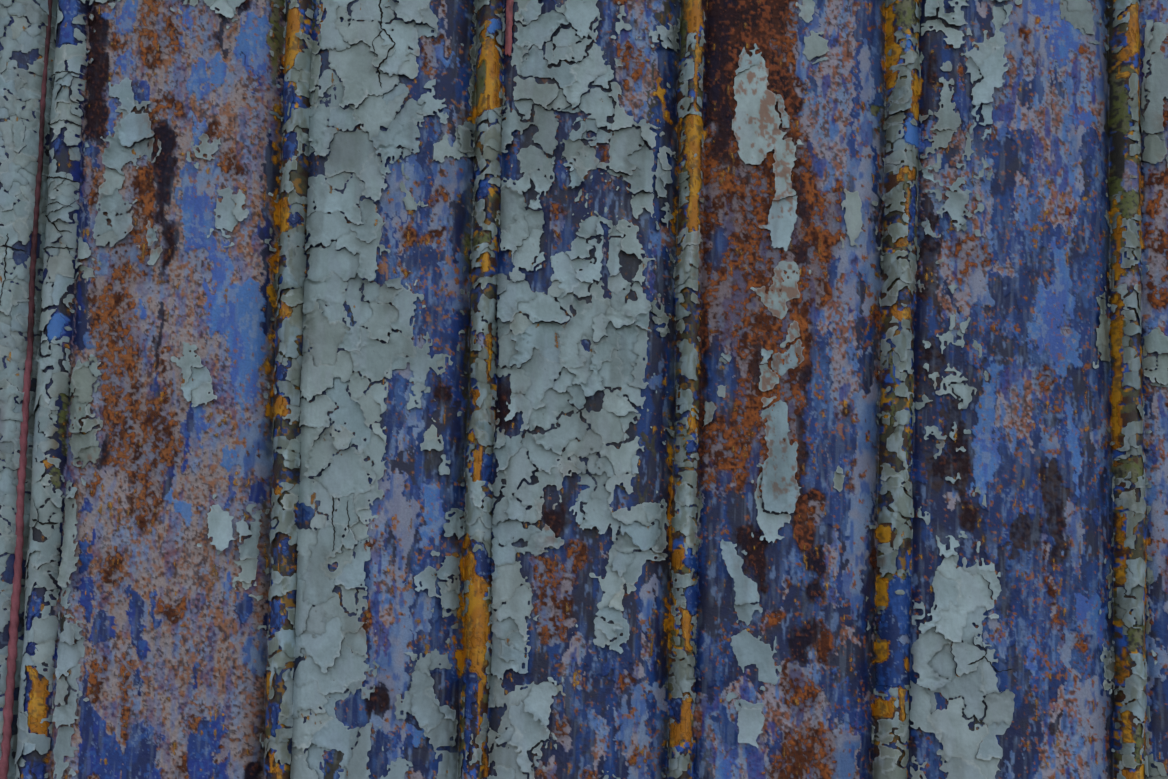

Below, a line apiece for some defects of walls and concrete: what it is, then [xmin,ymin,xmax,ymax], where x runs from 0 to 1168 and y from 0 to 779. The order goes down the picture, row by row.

corrosion [85,0,182,141]
peeling [181,102,221,174]
peeling [796,0,829,103]
corrosion [78,92,186,531]
corrosion [697,0,844,601]
corrosion [1138,168,1168,311]
peeling [171,342,235,436]
peeling [197,0,818,779]
peeling [837,0,1022,779]
peeling [1051,0,1168,779]
corrosion [778,618,834,712]
corrosion [770,721,837,779]